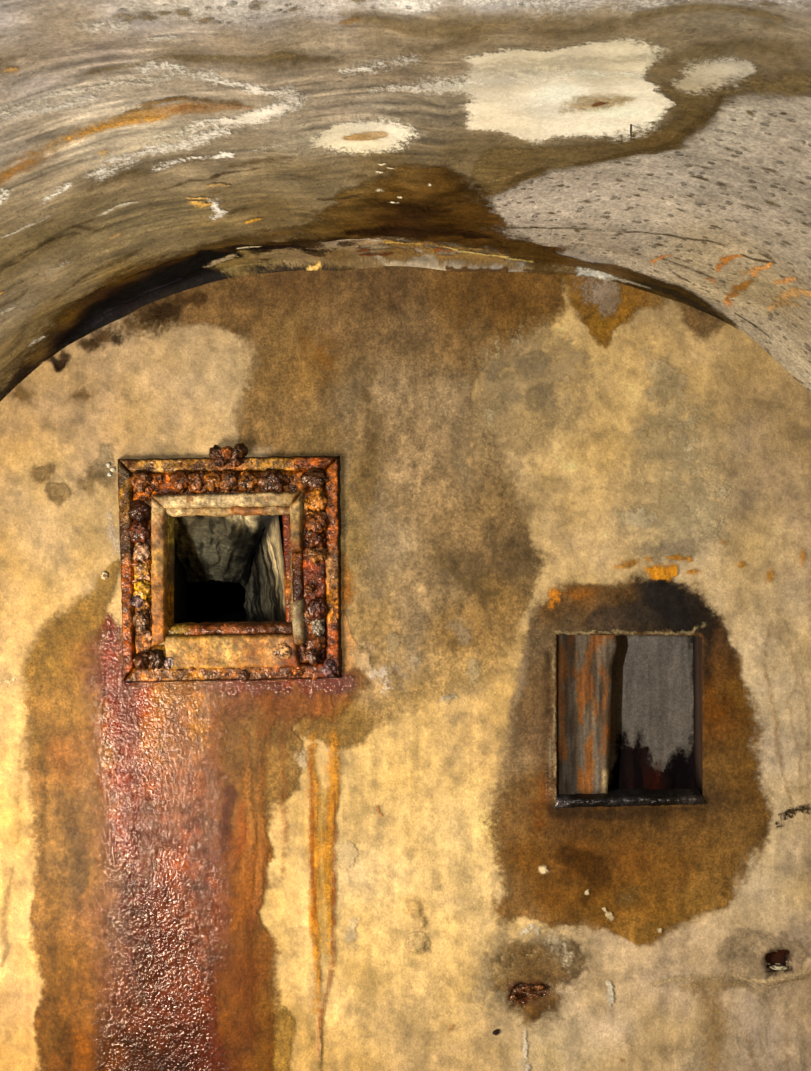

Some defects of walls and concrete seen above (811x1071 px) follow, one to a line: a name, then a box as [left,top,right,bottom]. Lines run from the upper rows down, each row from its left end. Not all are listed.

leakage [626,4,782,27]
rust [707,255,743,283]
rust [724,262,773,305]
leakage [0,13,811,749]
rust [548,588,588,609]
rust [616,554,697,581]
leakage [22,561,129,1071]
rust [83,554,357,1071]
leakage [205,689,332,1071]
leakage [490,577,772,946]
spalling [471,930,589,1030]
spalling [683,929,809,1071]